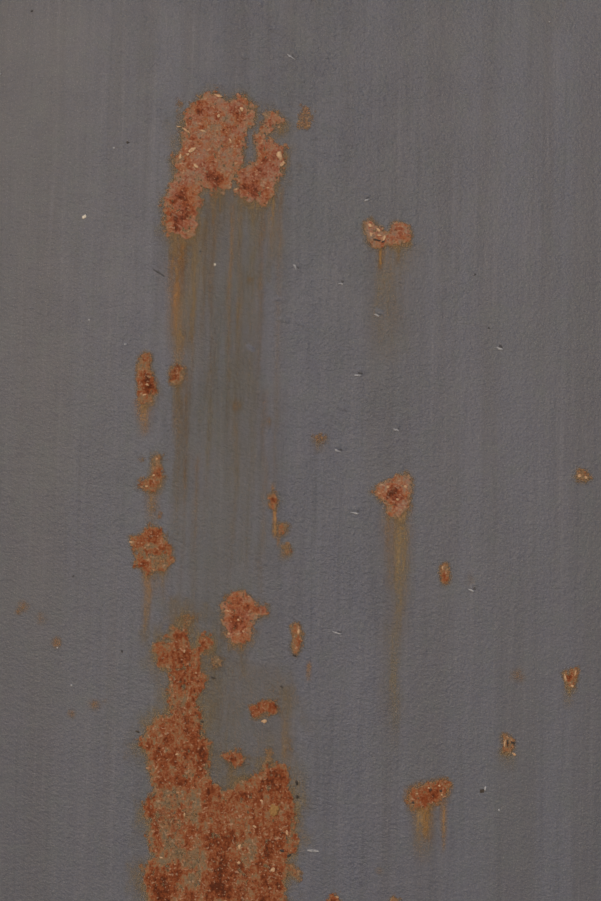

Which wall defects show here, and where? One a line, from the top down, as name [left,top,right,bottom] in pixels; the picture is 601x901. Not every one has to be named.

rust [159,90,289,387]
rust [363,216,412,268]
rust [135,352,158,426]
rust [129,454,175,627]
rust [267,487,293,555]
rust [371,471,415,611]
rust [438,562,451,584]
rust [219,589,269,648]
rust [562,667,580,692]
rust [135,614,305,901]
rust [501,733,516,756]
rust [404,777,452,835]